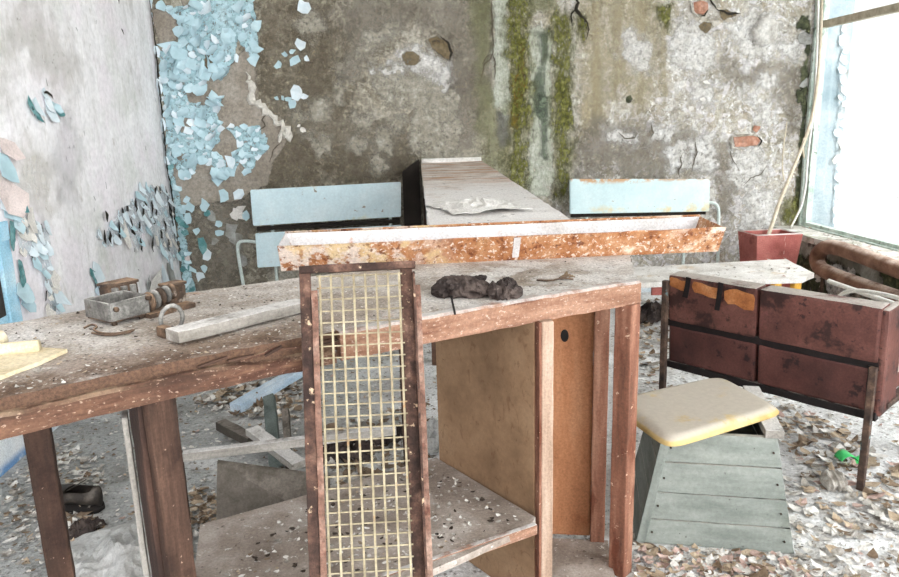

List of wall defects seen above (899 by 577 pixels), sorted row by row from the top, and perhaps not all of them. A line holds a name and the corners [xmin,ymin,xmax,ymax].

crack [570,0,590,40]
spalling [690,0,741,33]
spalling [402,51,421,66]
spalling [428,36,453,60]
peeling [28,80,65,123]
leakage [528,26,555,196]
peeling [98,0,311,293]
spalling [730,125,763,150]
peeling [0,138,72,316]